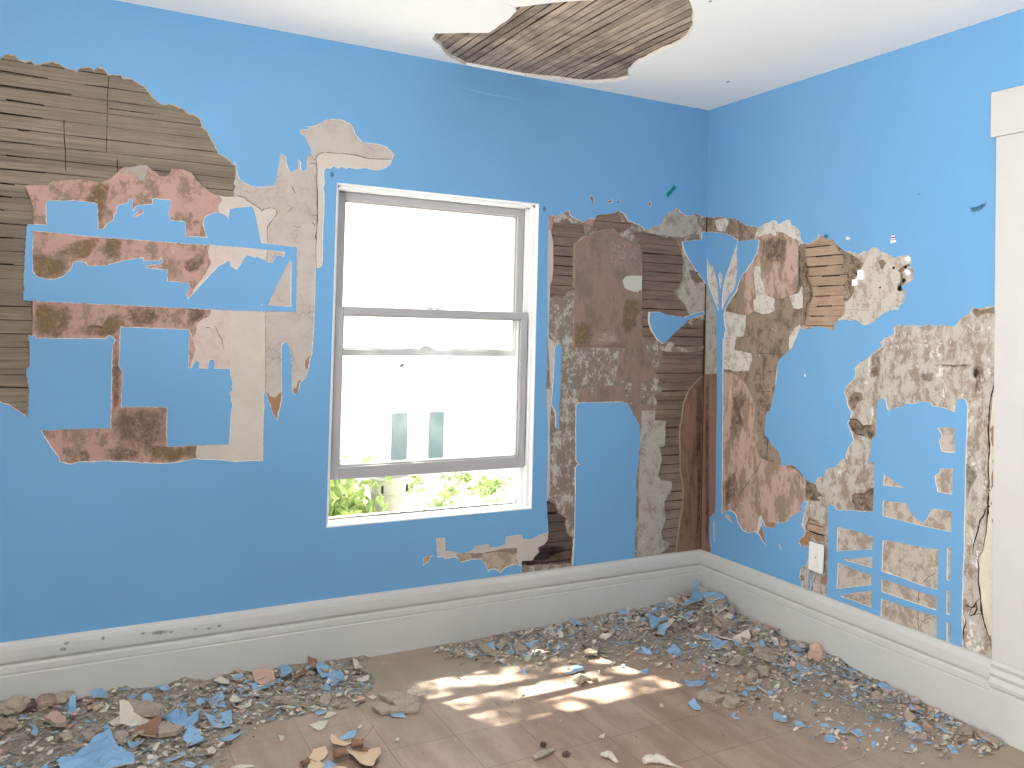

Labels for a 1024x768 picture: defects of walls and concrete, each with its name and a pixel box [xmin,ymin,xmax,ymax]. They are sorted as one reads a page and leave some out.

spalling [432,0,694,83]
peeling [24,119,394,465]
peeling [423,195,995,658]
crack [962,385,994,645]